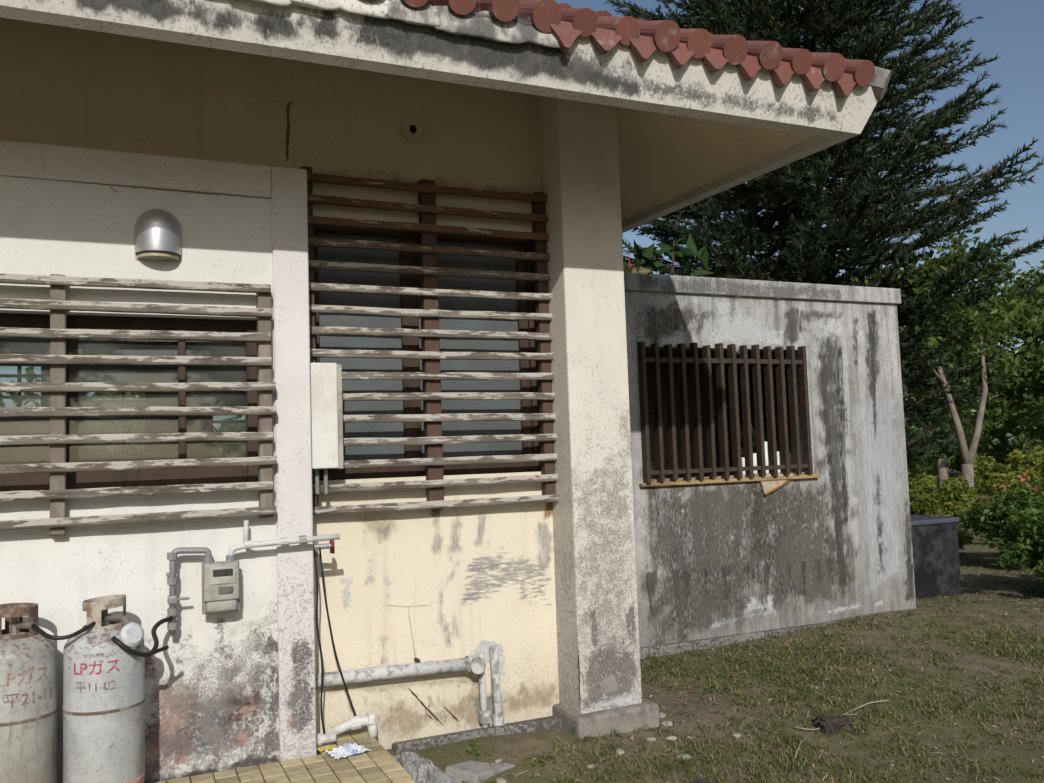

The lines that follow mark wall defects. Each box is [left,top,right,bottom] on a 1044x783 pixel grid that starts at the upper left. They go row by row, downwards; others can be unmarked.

leakage [77,0,337,39]
leakage [350,16,836,123]
crack [284,101,292,161]
leakage [638,274,841,343]
leakage [854,311,879,432]
leakage [642,337,859,645]
leakage [462,524,551,602]
leakage [578,416,637,708]
leakage [904,503,914,600]
leakage [145,619,315,773]